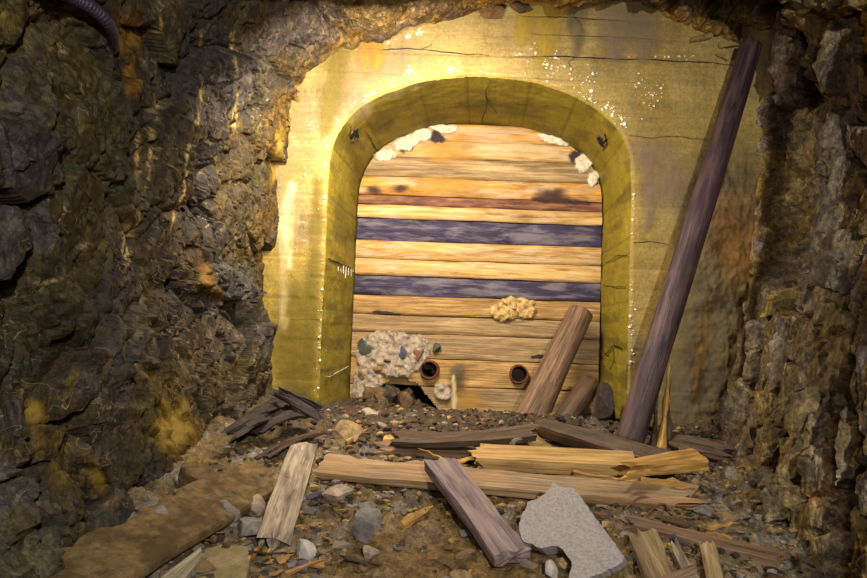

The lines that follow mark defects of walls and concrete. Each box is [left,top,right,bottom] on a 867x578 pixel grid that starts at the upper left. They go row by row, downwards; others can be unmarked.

crack [356,35,487,56]
damp [516,2,630,128]
crack [514,16,733,68]
spalling [595,133,606,150]